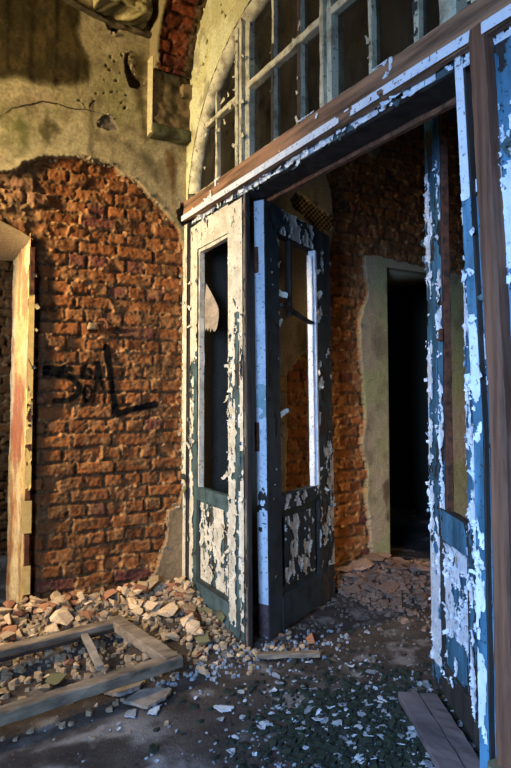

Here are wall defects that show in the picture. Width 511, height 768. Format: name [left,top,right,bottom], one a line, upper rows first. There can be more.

crack [1,100,109,118]
peeling [481,4,511,45]
peeling [498,114,511,285]
spalling [0,29,471,647]
spalling [276,52,488,745]